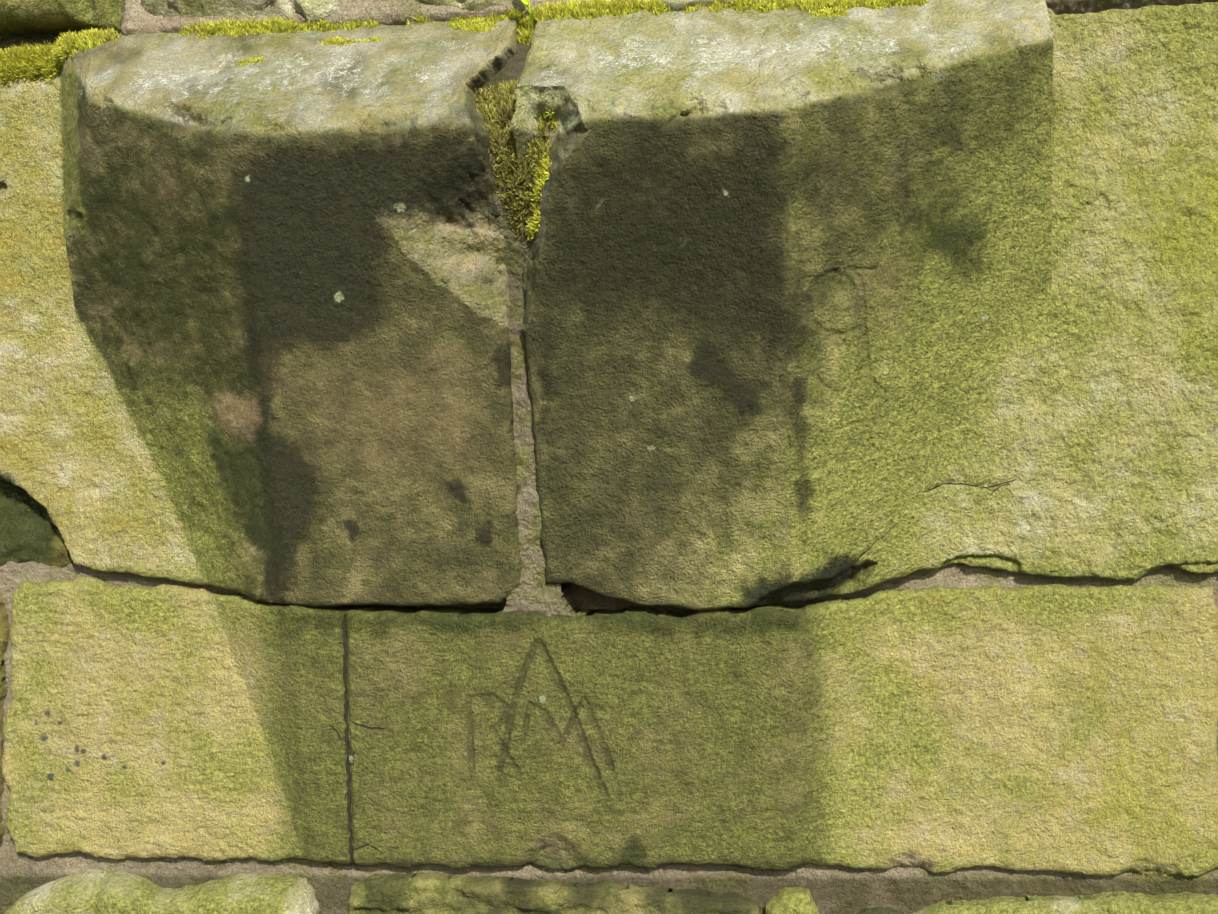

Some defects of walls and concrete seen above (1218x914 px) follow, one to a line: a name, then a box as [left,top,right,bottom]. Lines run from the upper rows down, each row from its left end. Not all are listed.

crack [828,525,895,582]
crack [328,617,386,865]